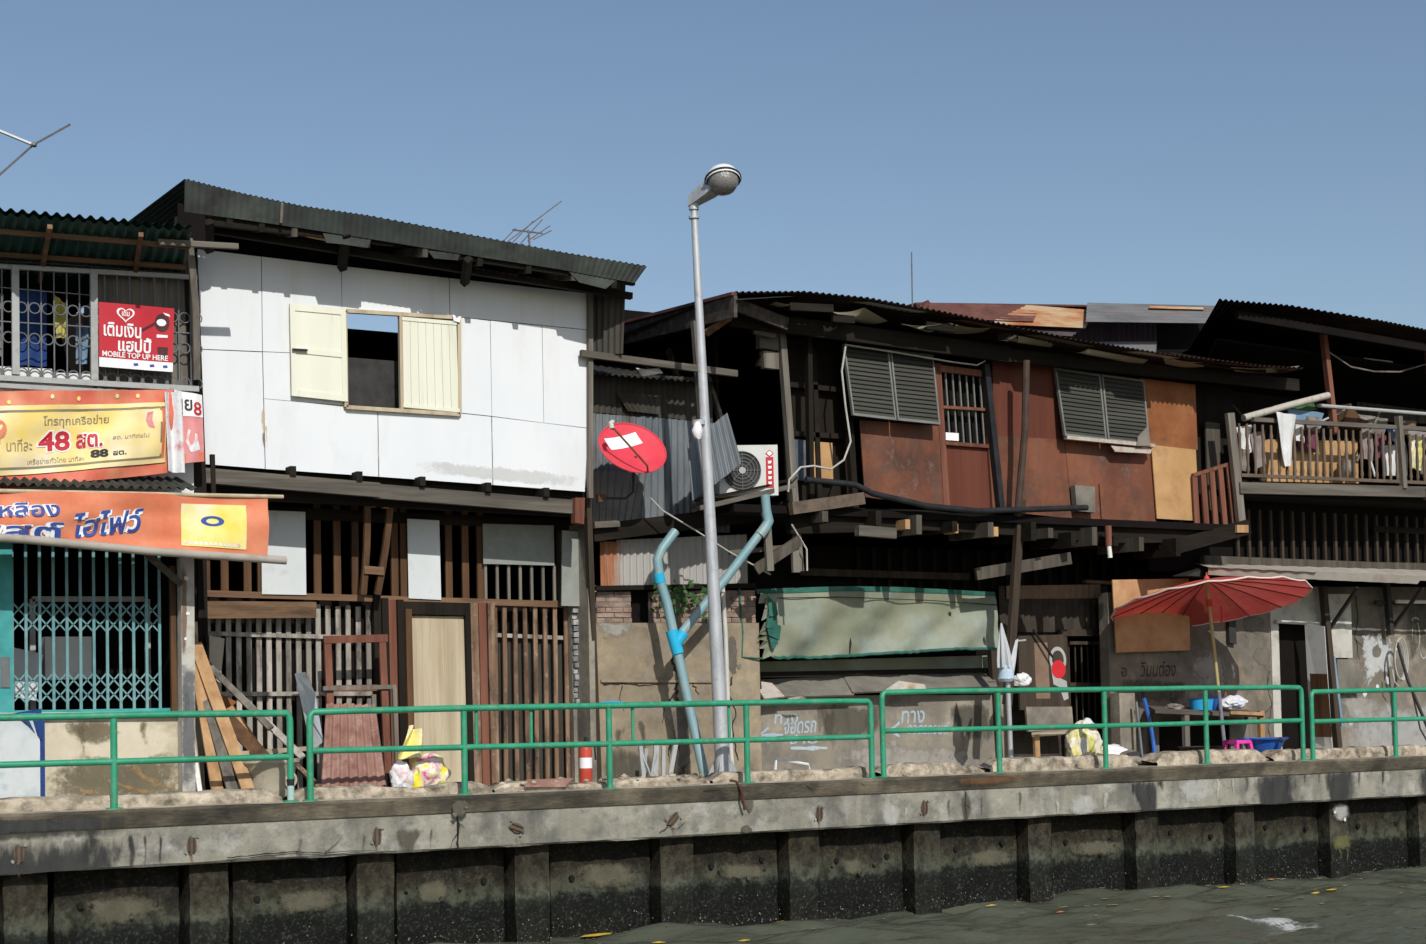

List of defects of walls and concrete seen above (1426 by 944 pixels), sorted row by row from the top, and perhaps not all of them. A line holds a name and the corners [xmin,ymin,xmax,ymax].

peeling [1343,634,1397,726]
damp [579,864,635,887]
damp [719,865,767,880]
damp [831,861,877,876]
damp [969,850,1011,867]
damp [1073,841,1118,856]
damp [88,898,157,923]
damp [277,891,339,911]
damp [405,881,463,902]